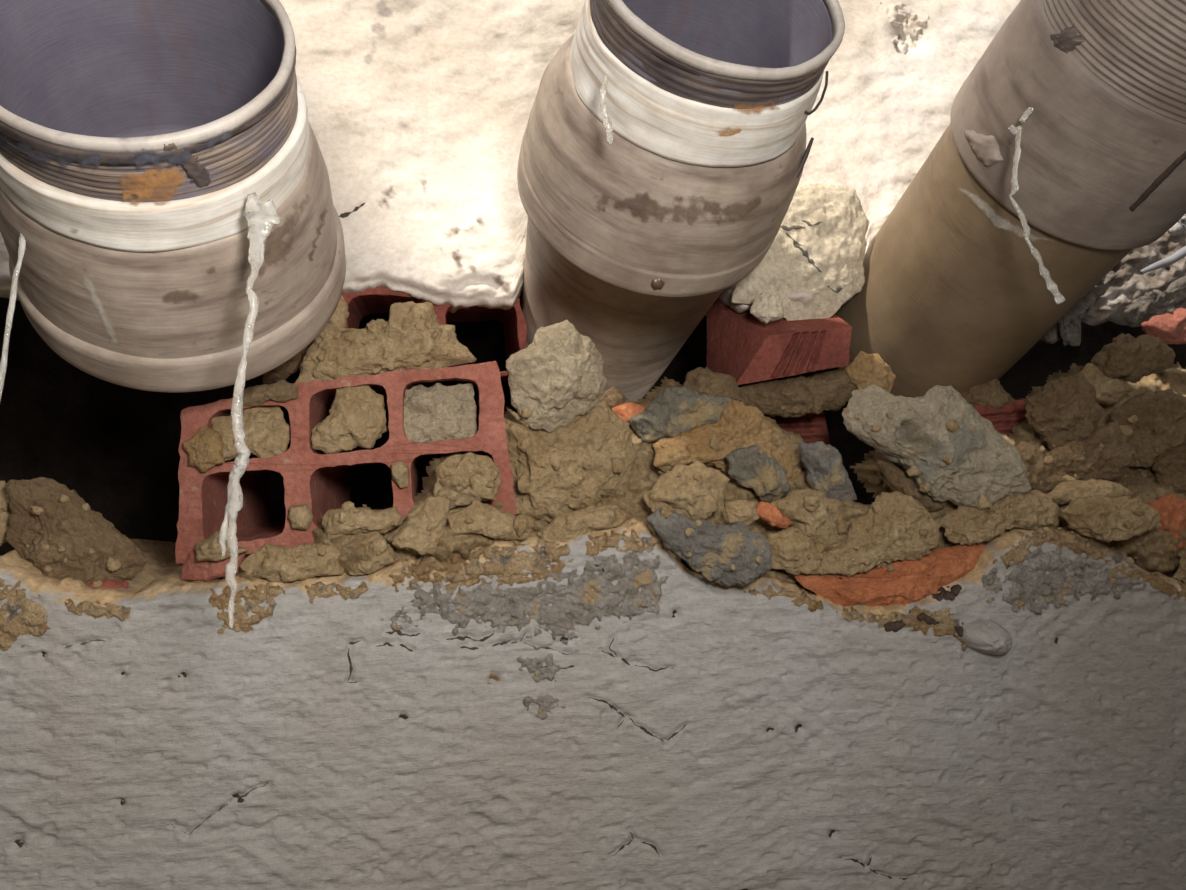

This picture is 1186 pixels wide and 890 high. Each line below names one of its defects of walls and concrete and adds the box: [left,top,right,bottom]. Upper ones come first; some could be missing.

rust [122,168,184,204]
crack [339,203,365,218]
spalling [982,526,1186,615]
spalling [0,577,51,652]
spalling [64,598,132,621]
spalling [208,580,288,634]
spalling [305,527,679,720]
spalling [744,585,968,651]
crack [347,630,574,683]
crack [603,638,673,672]
crack [590,697,687,742]
crack [171,781,269,835]